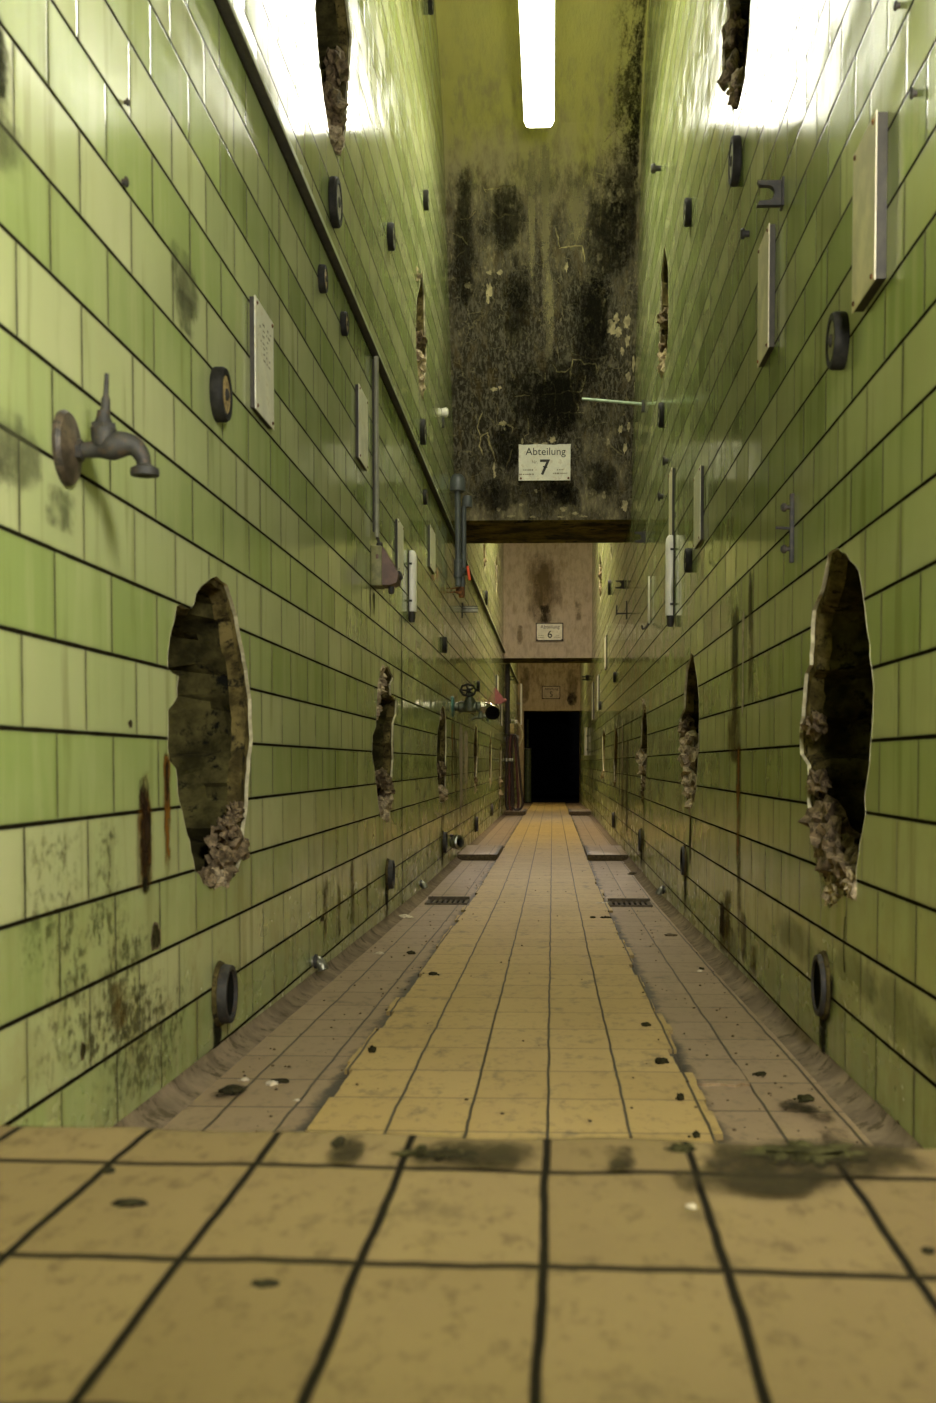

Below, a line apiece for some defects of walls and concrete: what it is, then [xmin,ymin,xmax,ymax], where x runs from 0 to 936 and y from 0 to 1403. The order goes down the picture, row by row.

spalling [315,0,352,156]
spalling [717,0,751,112]
water stain [454,172,474,306]
water stain [480,0,646,510]
spalling [167,576,253,891]
spalling [372,664,397,824]
spalling [677,653,699,864]
spalling [797,548,874,908]
water stain [324,861,368,935]
water stain [64,938,182,1089]
water stain [214,1022,222,1049]